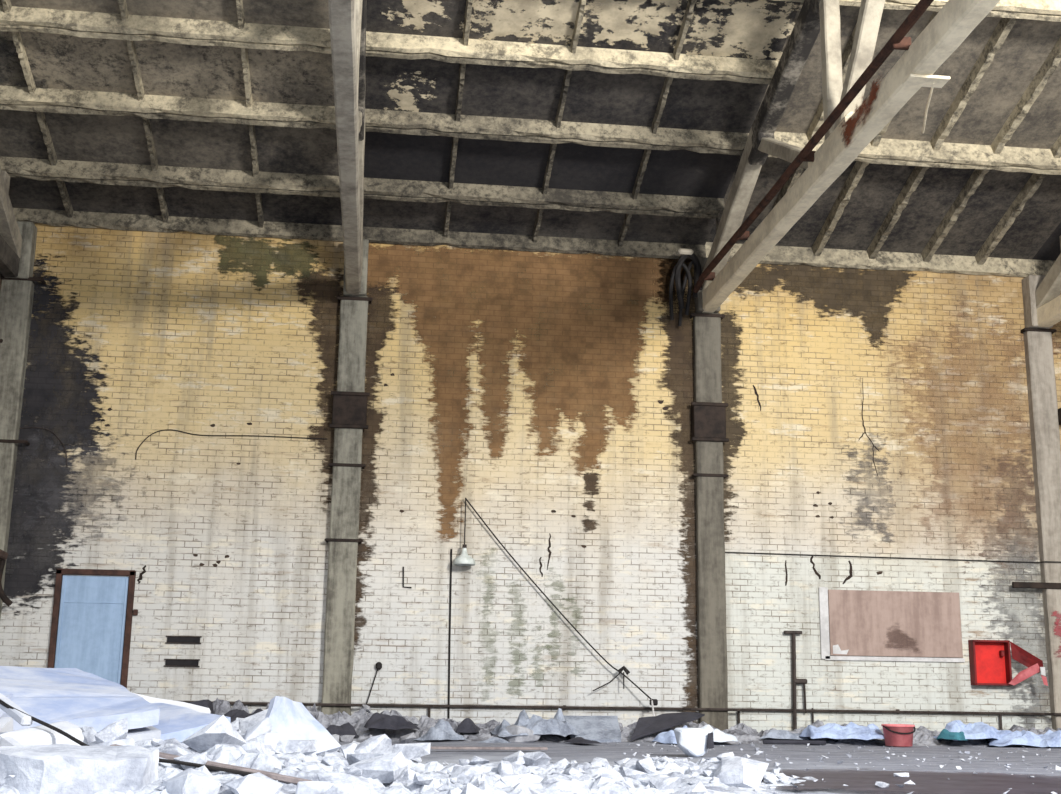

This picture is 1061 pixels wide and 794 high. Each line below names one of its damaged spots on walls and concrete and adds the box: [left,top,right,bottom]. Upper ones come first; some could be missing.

spalling [382,0,803,63]
rust [841,79,880,147]
water stain [734,263,917,348]
water stain [214,235,344,512]
water stain [354,244,699,724]
water stain [721,310,747,542]
water stain [845,448,887,479]
water stain [856,498,892,541]